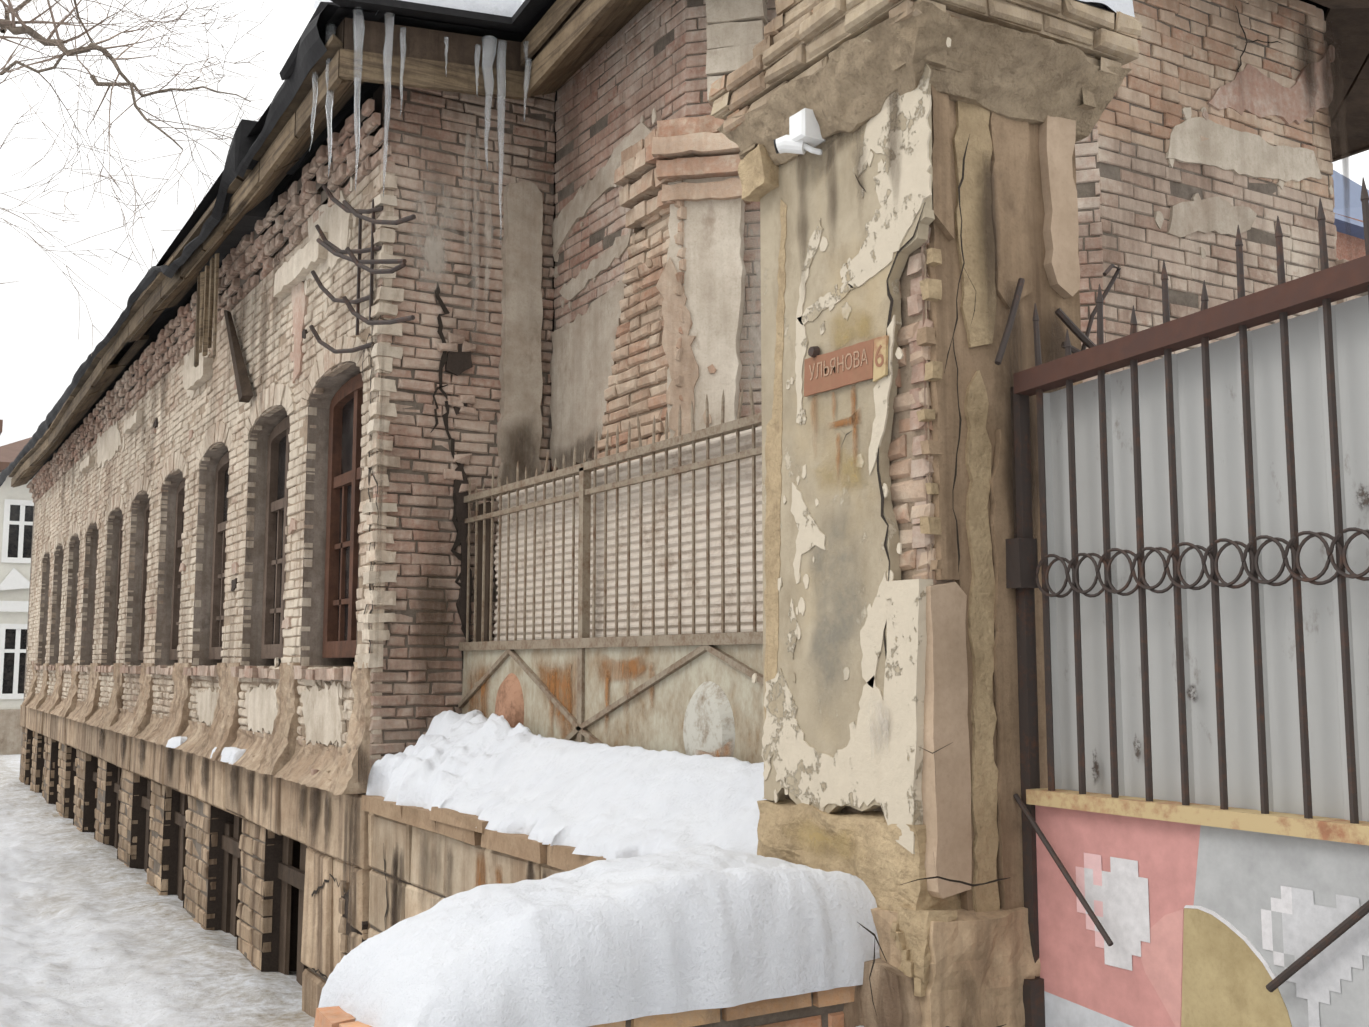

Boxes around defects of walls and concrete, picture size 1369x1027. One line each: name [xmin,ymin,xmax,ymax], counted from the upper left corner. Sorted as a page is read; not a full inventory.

crack [430,282,473,664]
spalling [752,64,955,812]
rust [470,671,487,715]
rust [541,669,575,729]
crack [900,852,1008,910]
crack [857,922,887,1015]